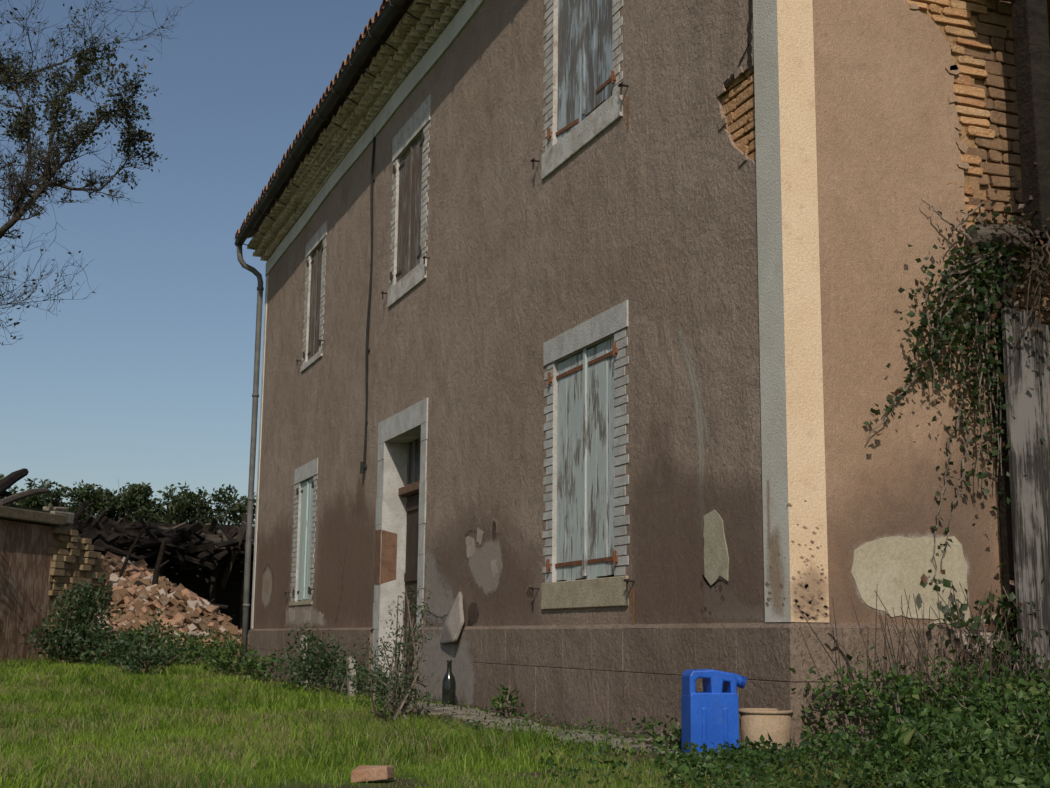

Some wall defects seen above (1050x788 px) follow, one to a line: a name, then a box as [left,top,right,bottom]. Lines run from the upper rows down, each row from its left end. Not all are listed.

flaking render [716,67,756,167]
flaking render [906,0,995,234]
flaking render [465,517,503,594]
flaking render [700,510,829,621]